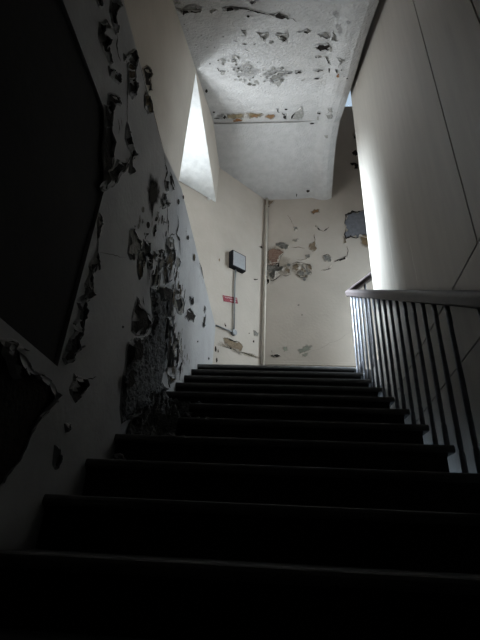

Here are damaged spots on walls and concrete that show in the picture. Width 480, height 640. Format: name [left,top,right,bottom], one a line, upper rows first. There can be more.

peeling [209,55,304,87]
peeling [256,31,289,44]
spalling [313,32,348,80]
peeling [96,0,153,192]
peeling [276,106,304,120]
spalling [343,210,368,247]
peeling [266,237,332,285]
peeling [62,212,104,365]
spalling [119,206,196,424]
peeling [223,337,243,352]
spalling [0,337,63,486]
spalling [69,374,96,403]